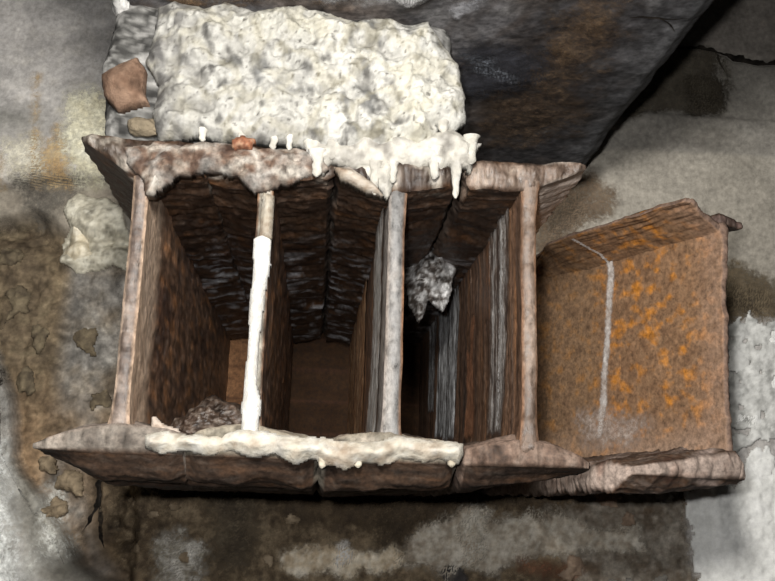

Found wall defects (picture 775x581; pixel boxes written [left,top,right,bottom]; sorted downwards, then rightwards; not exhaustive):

crack [631,16,775,72]
water stain [621,47,731,118]
water stain [123,0,552,471]
crack [84,480,104,547]